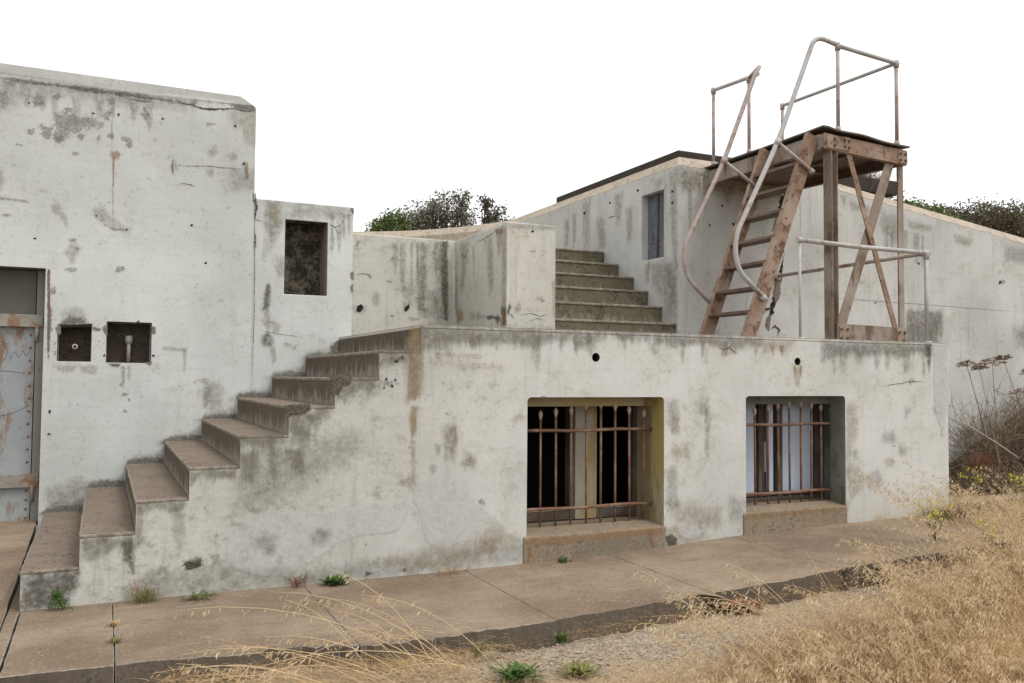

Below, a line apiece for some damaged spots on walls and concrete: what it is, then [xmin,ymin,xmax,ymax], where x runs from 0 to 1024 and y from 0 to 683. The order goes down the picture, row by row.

peeling [28,94,133,148]
crack [146,158,305,368]
water stain [424,242,600,346]
water stain [824,312,940,365]
water stain [84,538,134,570]
water stain [21,569,80,611]